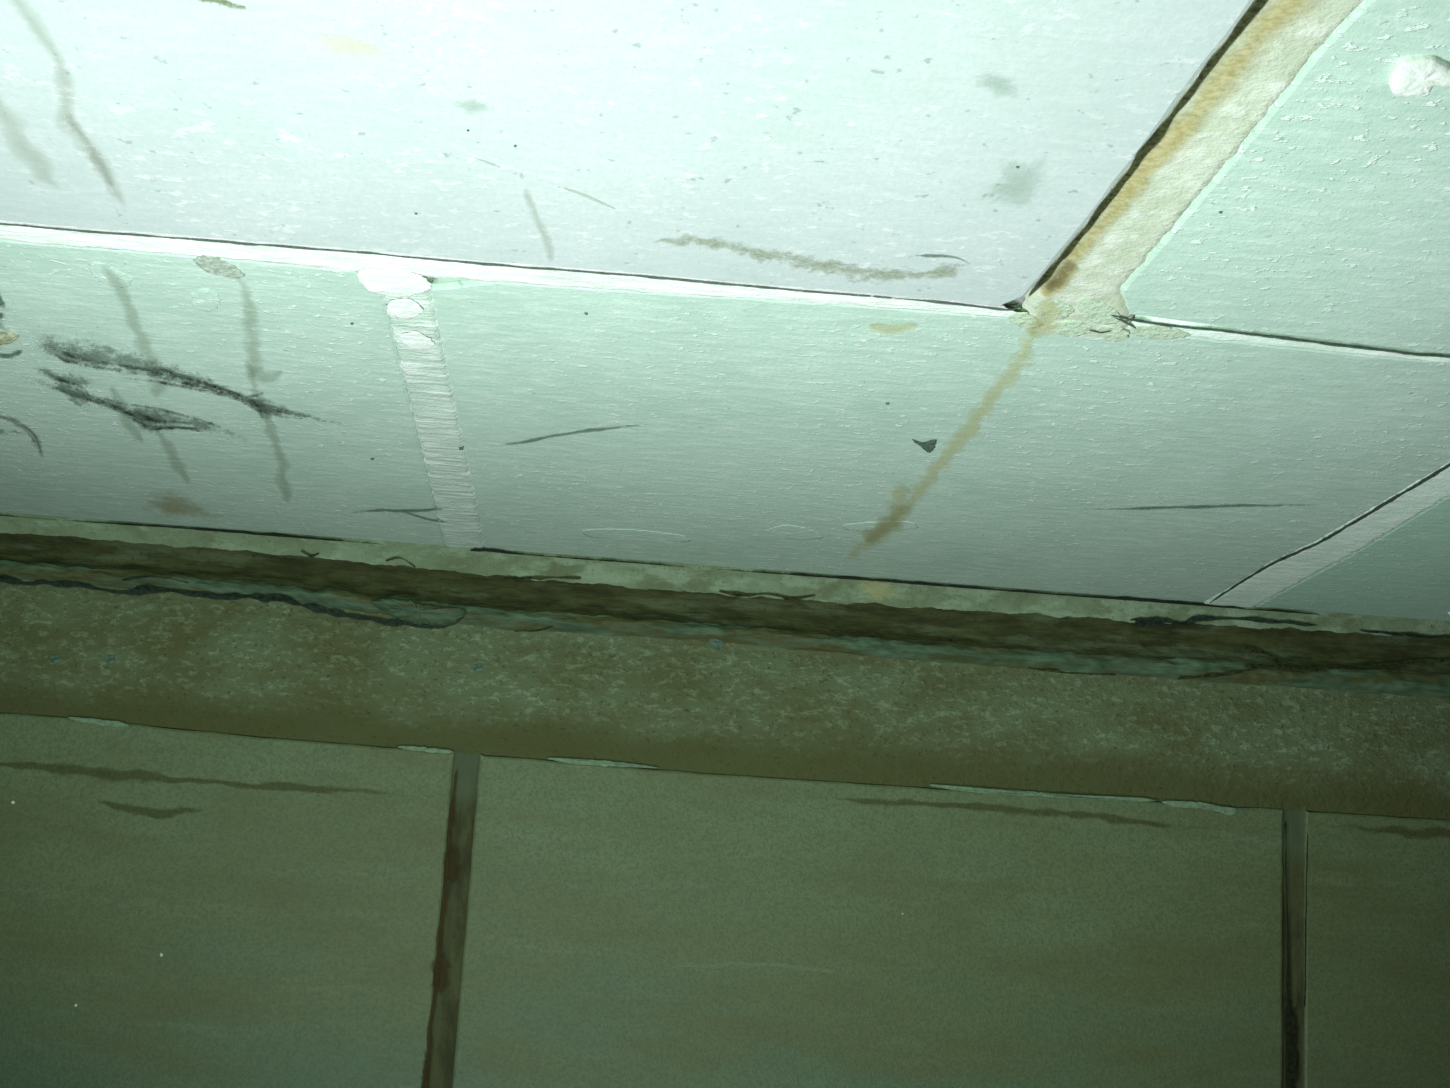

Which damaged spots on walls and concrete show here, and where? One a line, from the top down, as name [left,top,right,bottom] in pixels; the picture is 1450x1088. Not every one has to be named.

water stain [40,337,318,435]